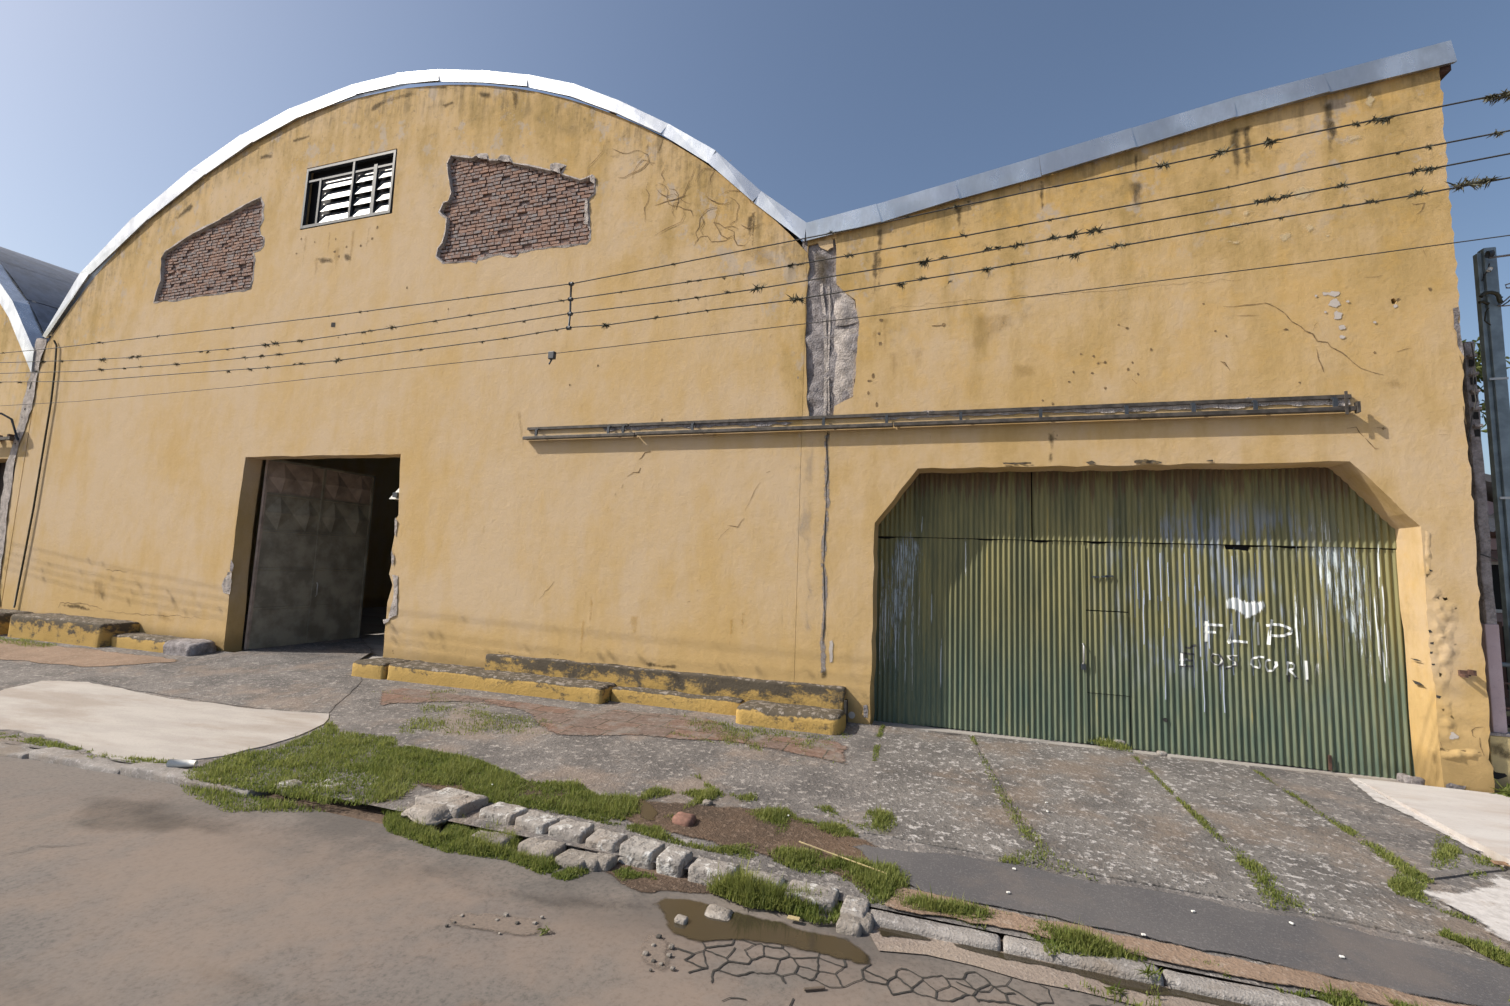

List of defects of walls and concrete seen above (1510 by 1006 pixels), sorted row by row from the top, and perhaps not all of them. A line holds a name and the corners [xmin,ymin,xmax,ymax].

damp [1232,127,1250,163]
flaking render [153,197,265,303]
flaking render [435,153,596,264]
flaking render [797,239,1351,420]
crack [924,279,1409,375]
flaking render [602,418,792,431]